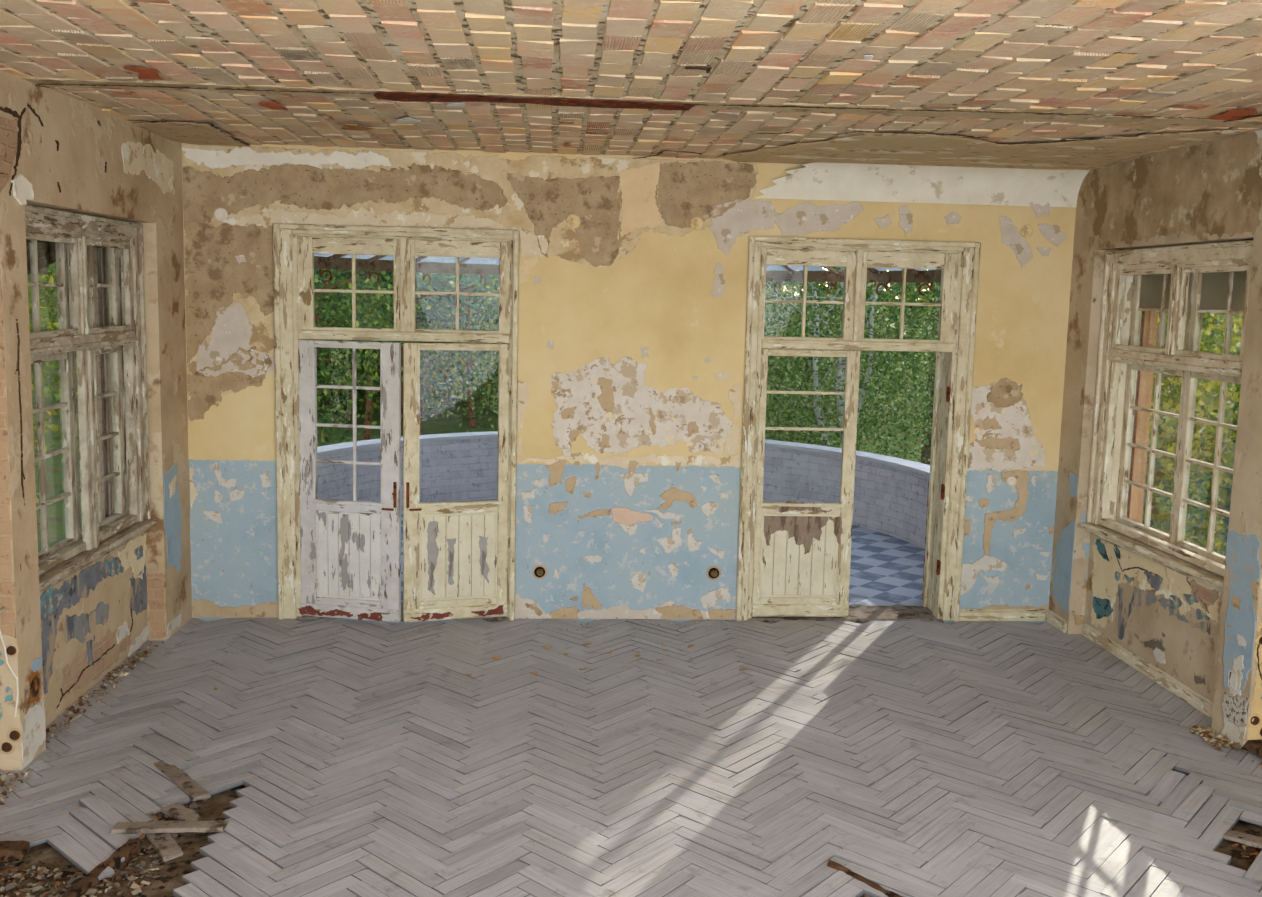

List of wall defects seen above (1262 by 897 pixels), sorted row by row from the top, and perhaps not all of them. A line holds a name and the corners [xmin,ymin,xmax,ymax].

crack [0,83,371,196]
crack [693,104,1262,145]
peeling [182,144,913,421]
peeling [518,346,742,577]
peeling [960,378,1046,595]
peeling [1069,472,1079,497]
peeling [427,521,456,595]
peeling [479,536,490,583]
peeling [411,612,454,621]
peeling [471,583,735,619]
peeling [982,513,1262,740]